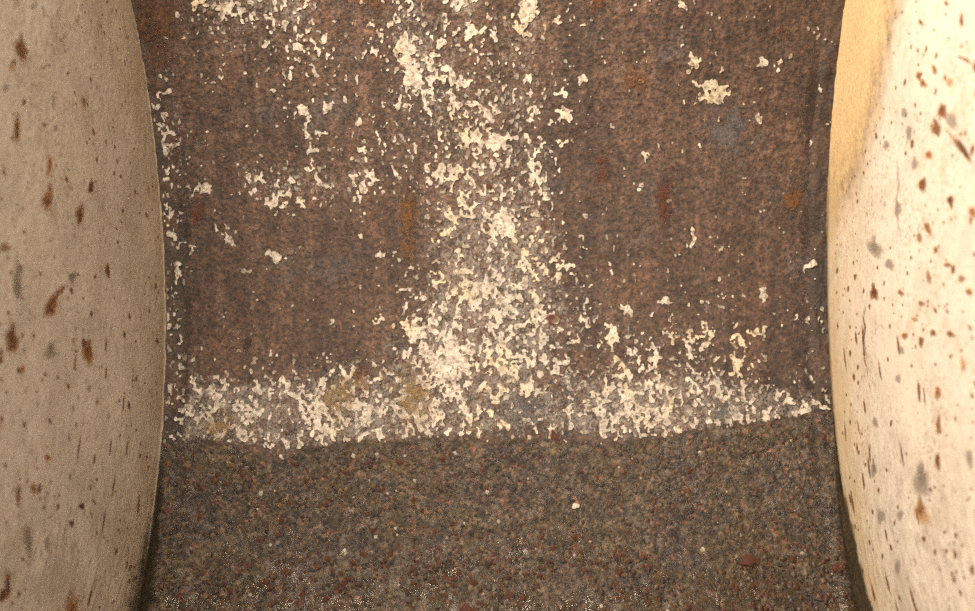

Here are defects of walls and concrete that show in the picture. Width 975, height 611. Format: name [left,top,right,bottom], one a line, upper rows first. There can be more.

rust [10,32,28,73]
rust [895,33,974,162]
rust [42,155,54,210]
rust [905,222,972,295]
rust [45,285,84,317]
rust [0,312,35,364]
rust [74,338,94,370]
rust [837,313,865,384]
rust [917,381,940,413]
rust [842,394,879,512]
rust [896,485,944,524]
rust [934,530,974,595]